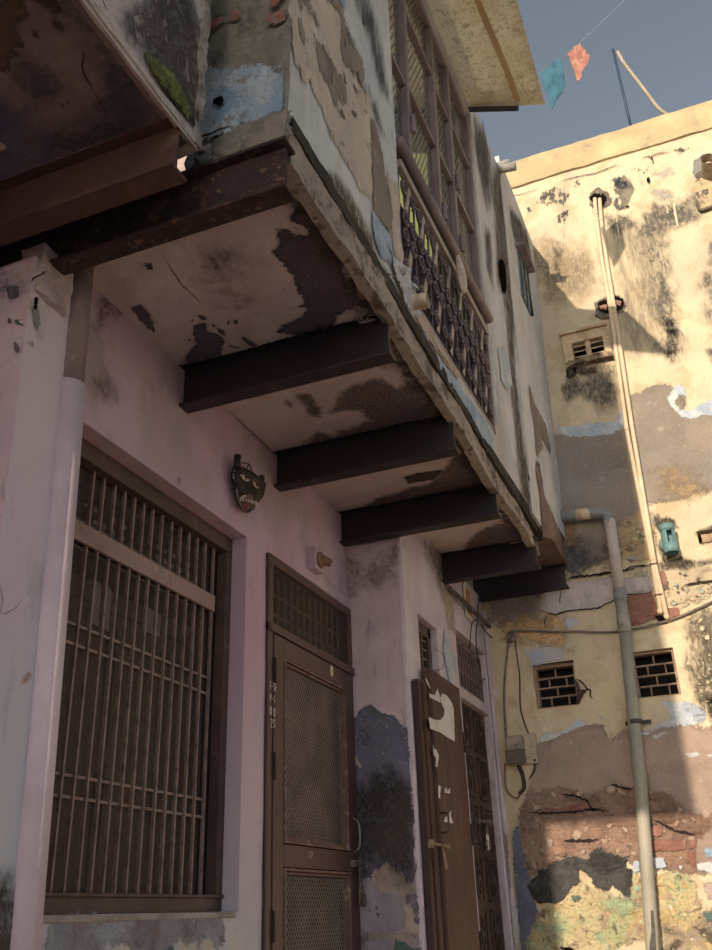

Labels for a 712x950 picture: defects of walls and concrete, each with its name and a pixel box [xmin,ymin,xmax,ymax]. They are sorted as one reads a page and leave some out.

peeling [265,0,512,446]
water stain [605,177,698,357]
water stain [562,364,615,409]
crack [543,564,649,627]
peeling [503,382,712,667]
crack [685,578,712,586]
water stain [0,876,14,950]
peeling [354,703,422,950]
crack [528,794,607,815]
spalling [504,716,645,950]
crack [564,836,595,844]
peeling [641,700,712,950]